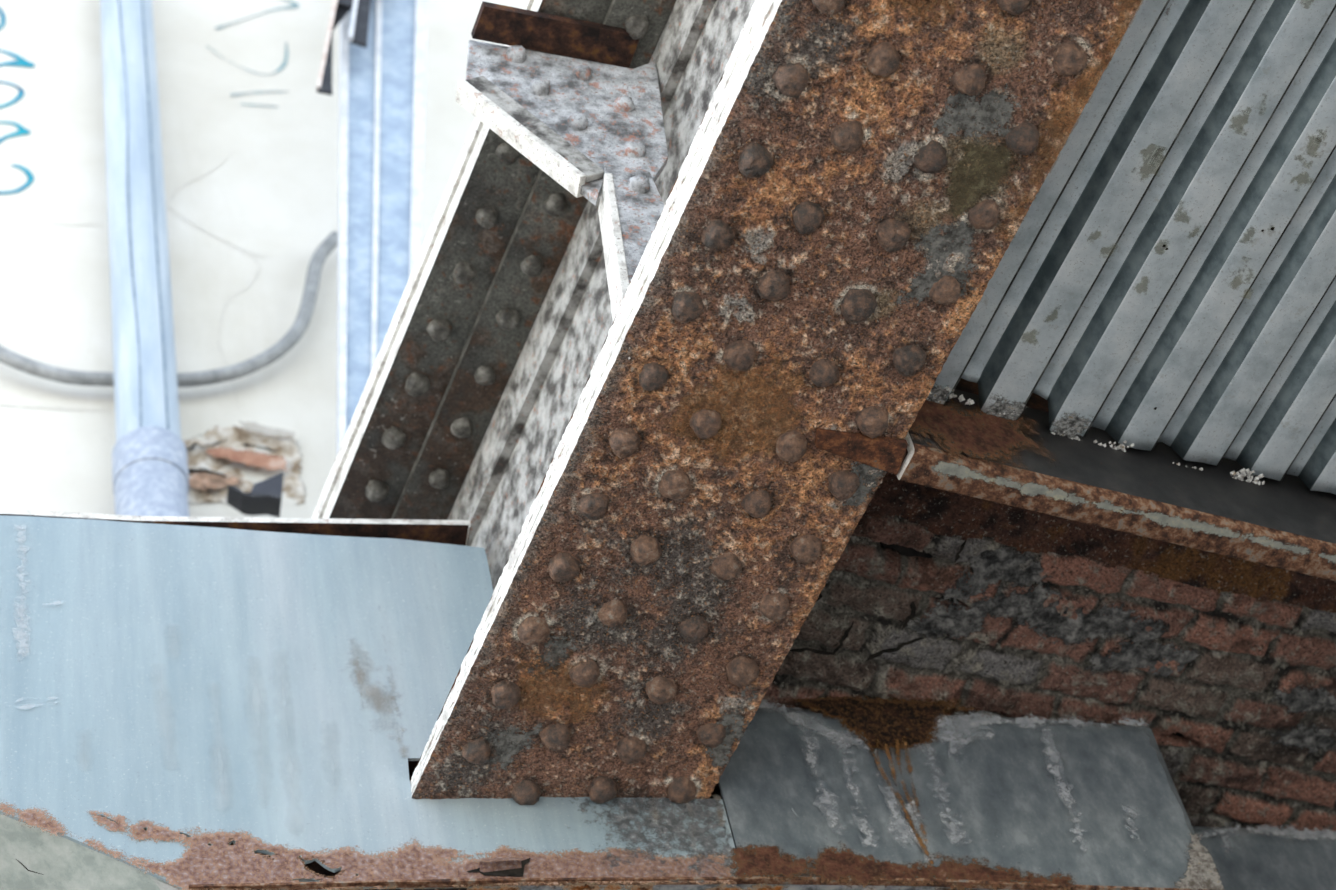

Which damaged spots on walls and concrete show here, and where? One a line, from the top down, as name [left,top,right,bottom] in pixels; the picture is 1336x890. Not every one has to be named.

crack [789,601,924,661]
crack [955,540,966,562]
rust [864,386,1336,613]
rust [0,695,1076,890]